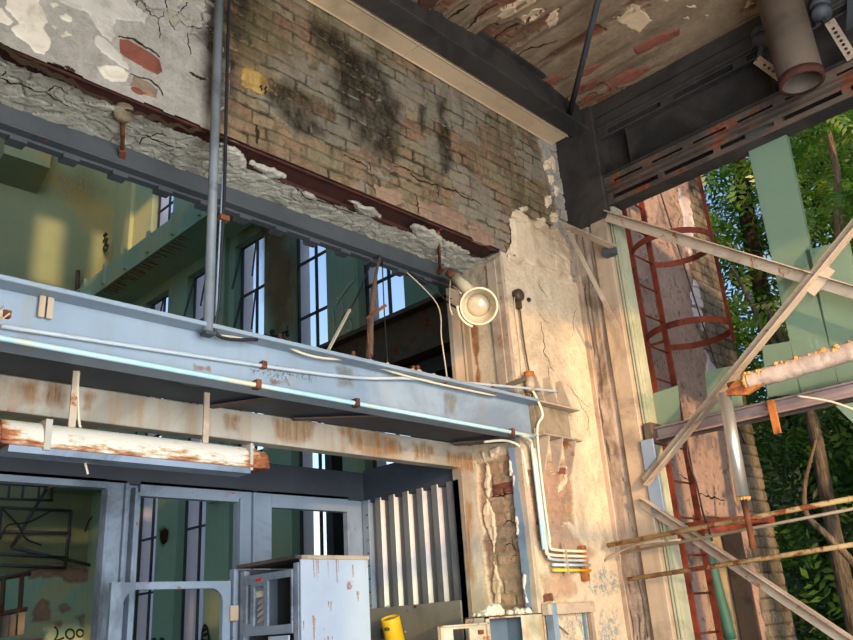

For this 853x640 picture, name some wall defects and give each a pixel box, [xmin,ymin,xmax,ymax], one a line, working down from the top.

peeling [0,0,163,98]
crack [0,42,207,148]
crack [134,0,206,80]
mould [270,86,320,133]
mould [312,25,398,156]
damp [438,103,452,173]
peeling [497,0,561,29]
corrosion [777,62,826,96]
flaking render [348,200,381,218]
flaking render [410,199,495,257]
flaking render [506,156,574,287]
peeling [481,445,532,609]